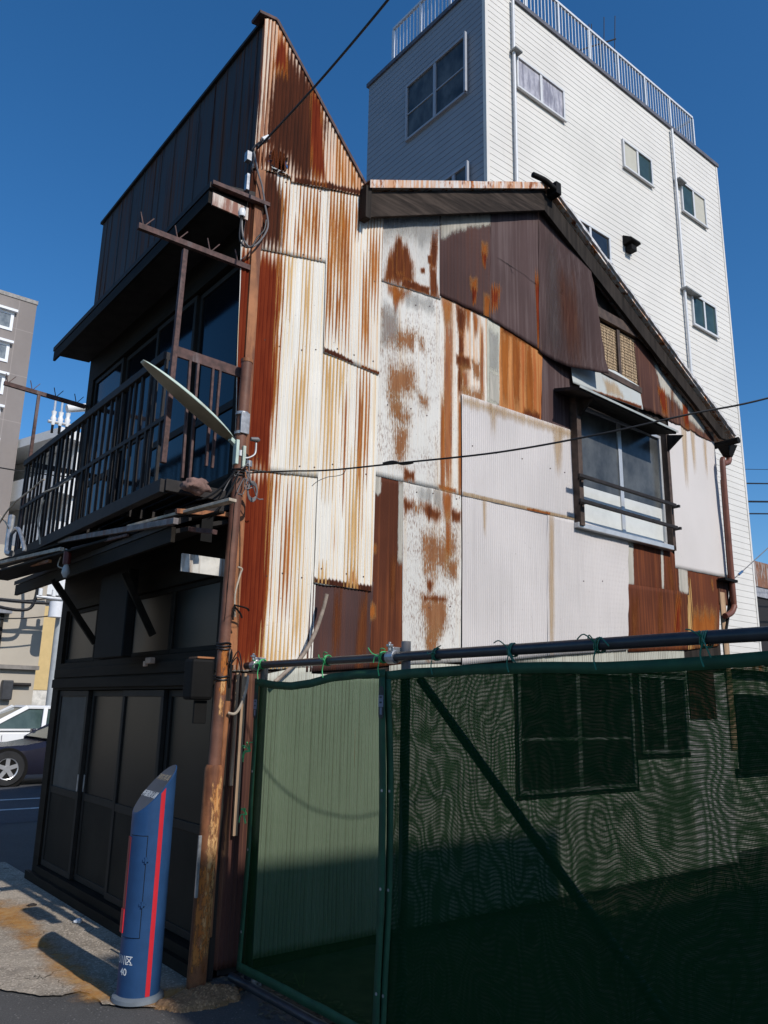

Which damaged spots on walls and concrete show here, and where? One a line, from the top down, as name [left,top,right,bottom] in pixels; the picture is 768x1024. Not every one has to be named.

rust [232,33,575,670]
rust [658,581,717,634]